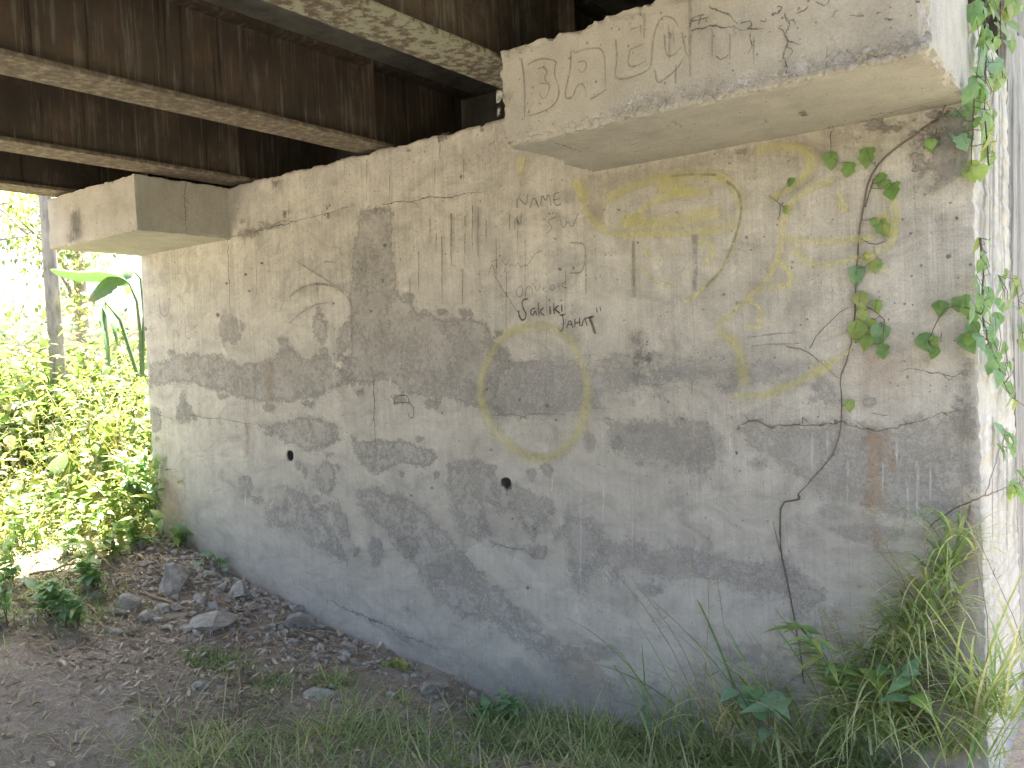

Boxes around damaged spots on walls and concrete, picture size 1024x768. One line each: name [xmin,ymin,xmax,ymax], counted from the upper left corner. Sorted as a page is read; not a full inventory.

crack [692,1,892,77]
water stain [494,355,788,419]
crack [736,409,964,432]